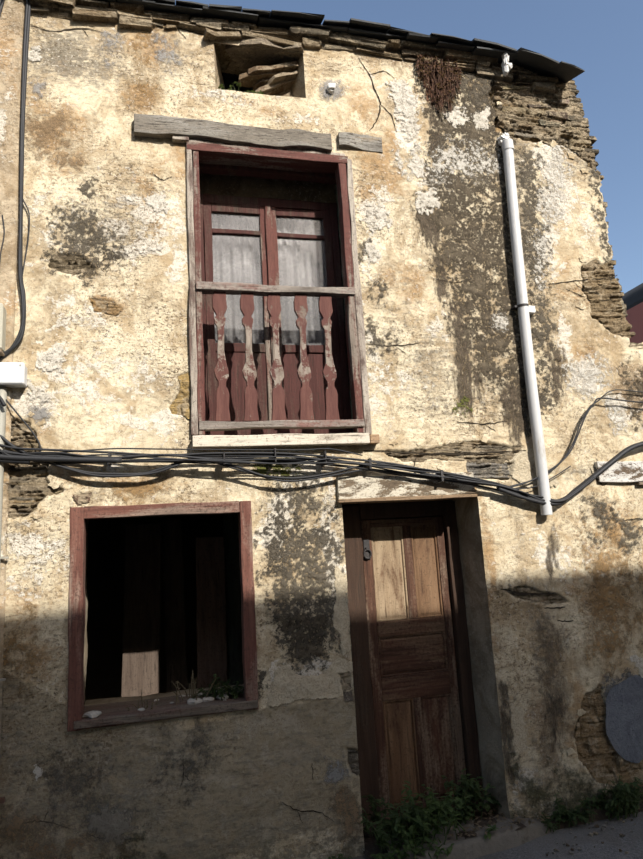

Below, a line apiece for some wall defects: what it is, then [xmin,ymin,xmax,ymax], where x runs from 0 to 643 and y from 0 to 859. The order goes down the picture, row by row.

crack [359,59,397,132]
spalling [48,248,93,275]
damp [25,112,132,289]
damp [407,63,567,447]
spalling [443,67,599,291]
damp [585,169,612,263]
spalling [575,257,631,338]
spalling [164,369,190,420]
spalling [7,378,63,519]
spalling [385,438,538,488]
damp [254,466,348,675]
crack [285,804,334,822]